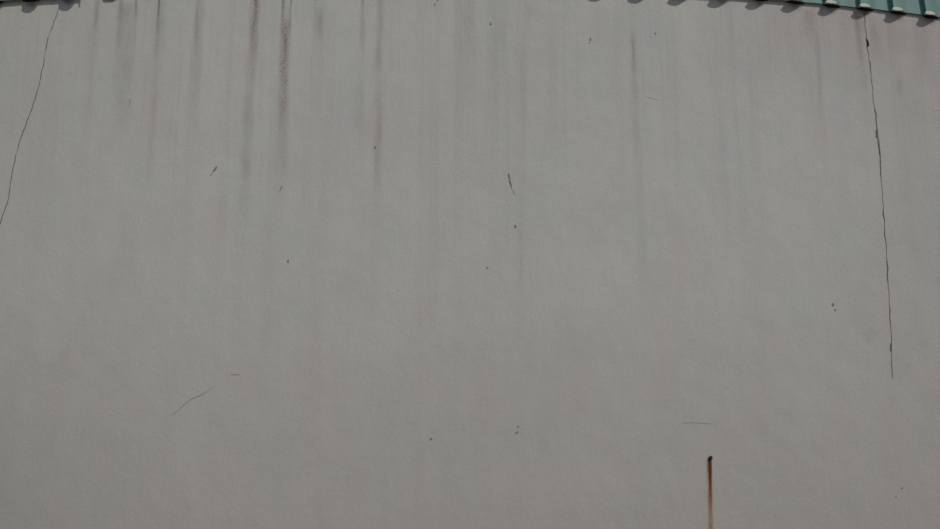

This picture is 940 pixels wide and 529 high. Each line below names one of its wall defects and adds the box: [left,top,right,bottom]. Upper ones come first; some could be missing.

crack [0,8,59,224]
crack [864,13,882,181]